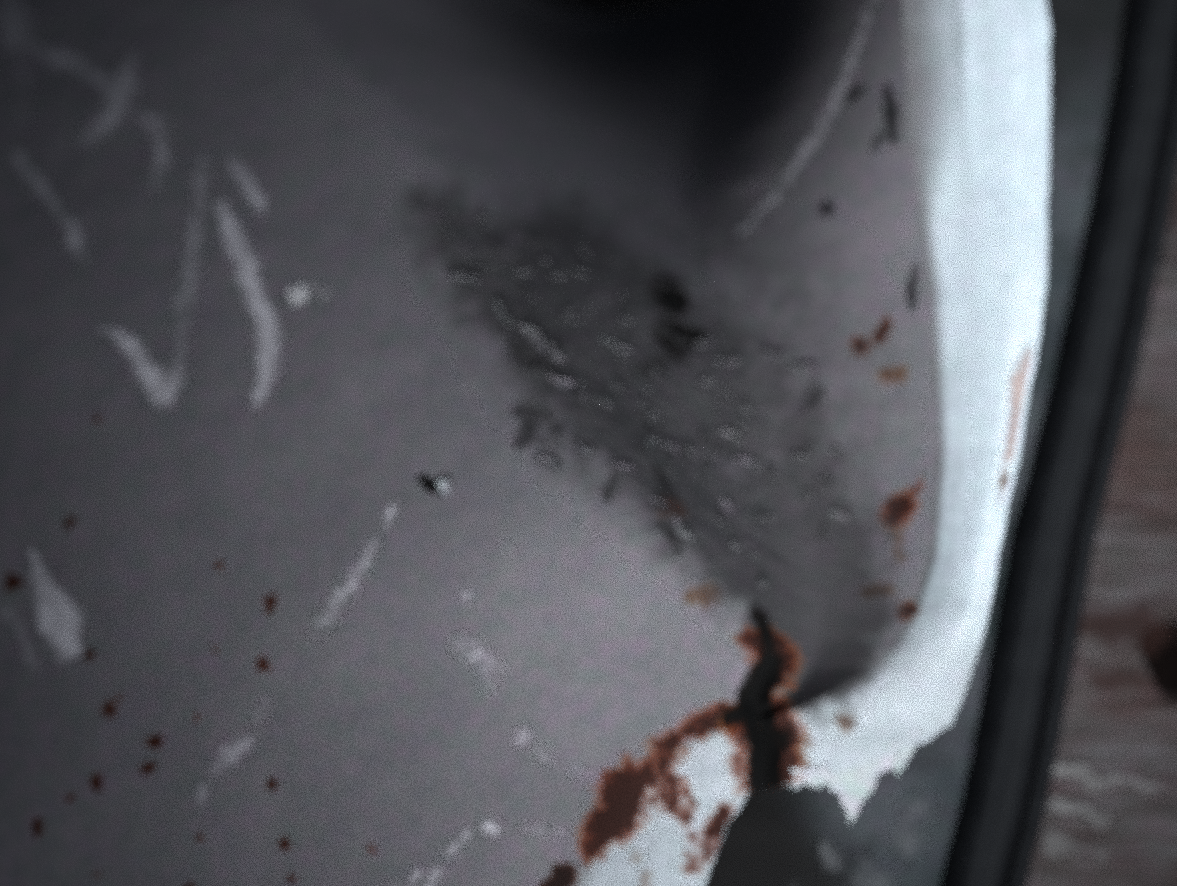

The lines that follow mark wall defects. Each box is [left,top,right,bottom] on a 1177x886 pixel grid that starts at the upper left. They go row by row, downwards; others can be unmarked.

rust [539,701,751,886]
rust [736,627,810,788]
peeling [838,716,853,731]
peeling [791,728,925,824]